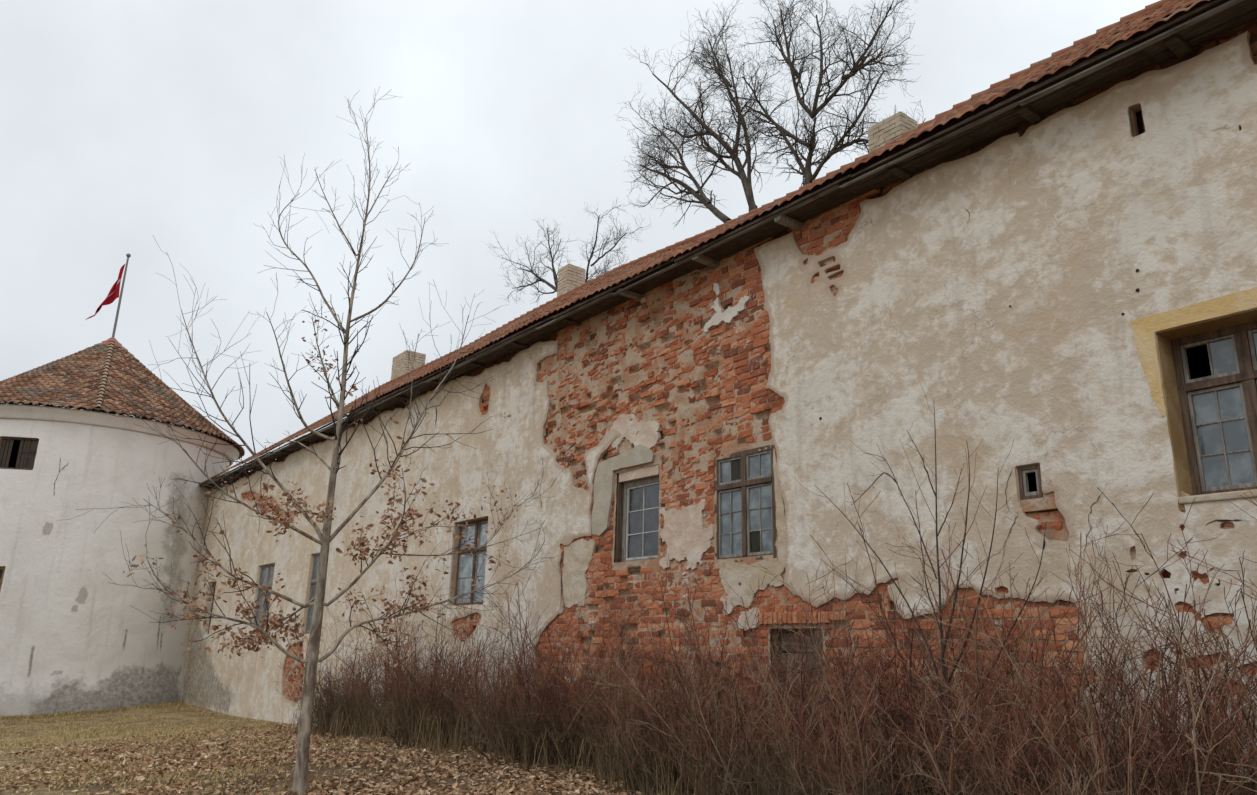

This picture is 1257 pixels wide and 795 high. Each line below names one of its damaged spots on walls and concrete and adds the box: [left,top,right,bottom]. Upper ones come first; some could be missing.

flaking render [480,385,490,415]
flaking render [536,180,1098,780]
flaking render [453,613,481,640]
flaking render [283,642,304,701]